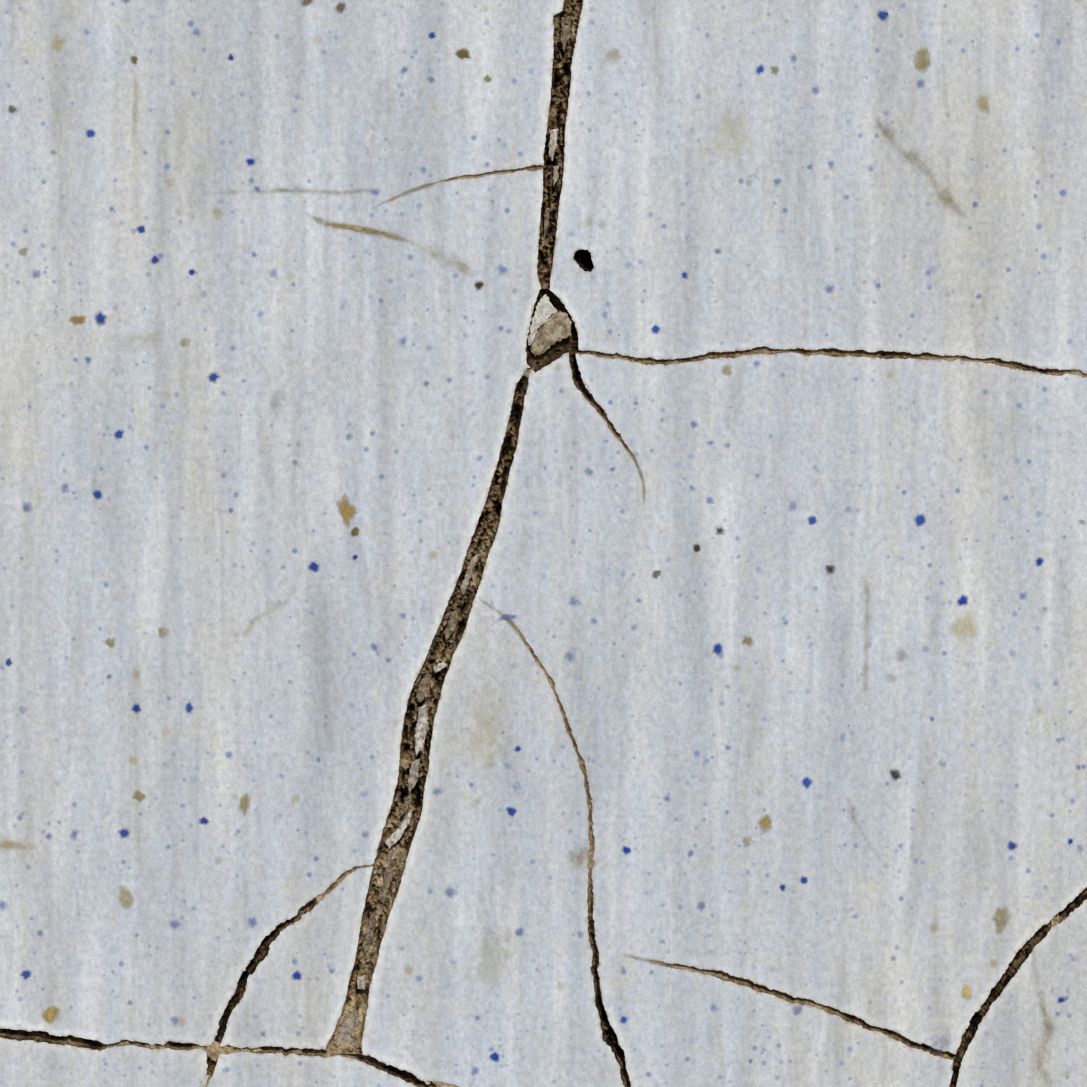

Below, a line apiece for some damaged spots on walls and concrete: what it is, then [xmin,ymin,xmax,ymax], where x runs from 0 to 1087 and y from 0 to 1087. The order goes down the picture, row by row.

crack [315,218,403,240]
crack [393,0,587,290]
crack [565,341,1087,491]
crack [0,365,534,1087]
crack [506,619,635,1087]
crack [636,882,1087,1087]